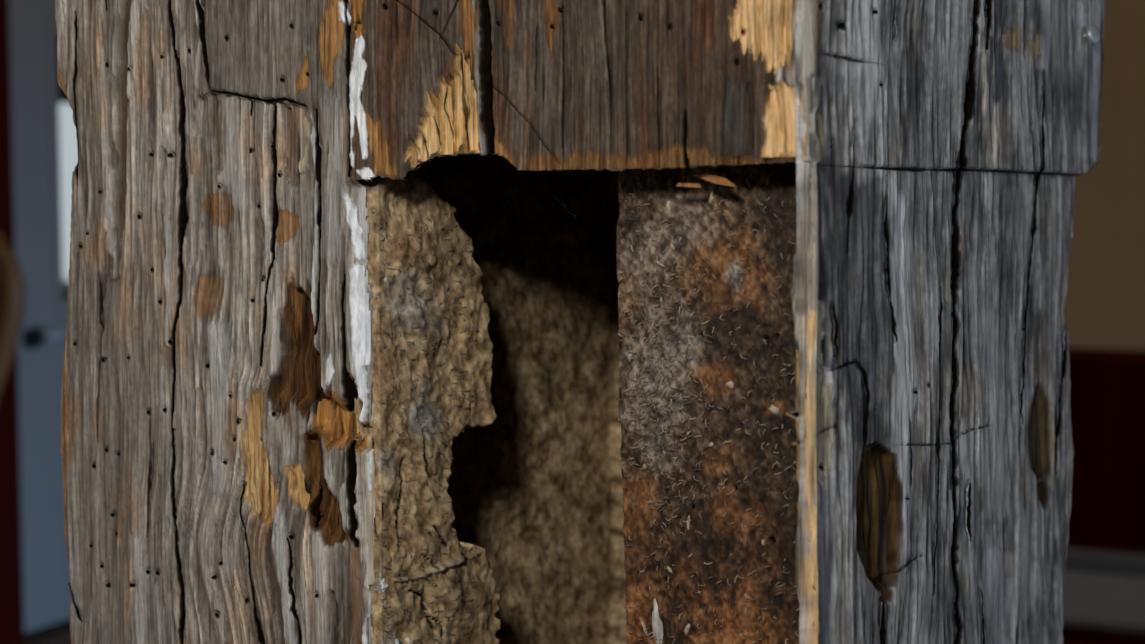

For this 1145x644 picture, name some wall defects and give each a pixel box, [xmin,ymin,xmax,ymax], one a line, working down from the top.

peeling [339,2,374,179]
crack [422,0,564,164]
peeling [762,80,806,160]
crack [146,0,358,644]
peeling [325,354,335,389]
peeling [344,193,374,491]
crack [880,0,993,644]
crack [1020,70,1045,425]
crack [1055,325,1067,474]
peeling [285,432,351,546]
crack [310,439,432,547]
peeling [641,598,663,644]